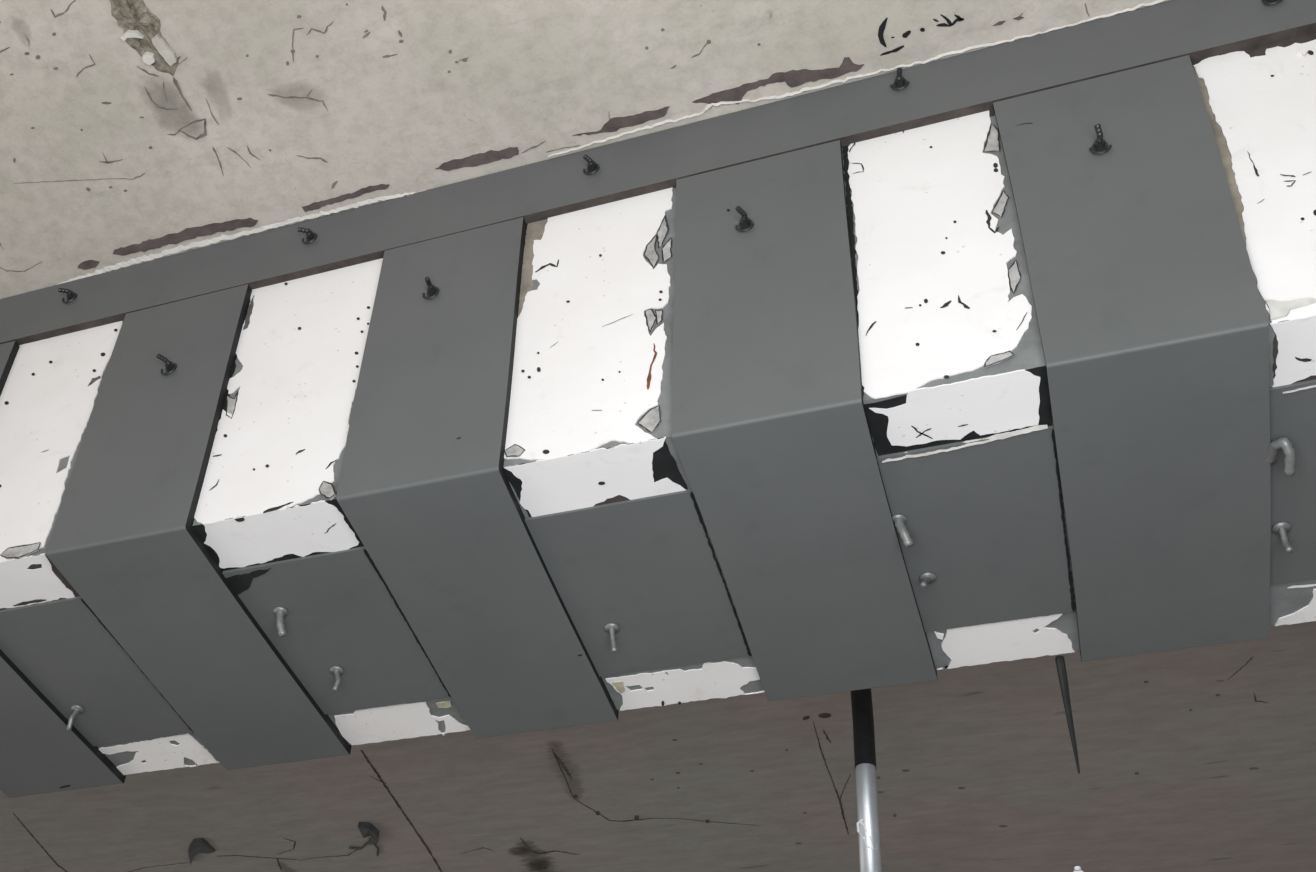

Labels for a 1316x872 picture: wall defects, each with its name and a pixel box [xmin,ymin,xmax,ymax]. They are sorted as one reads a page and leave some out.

spalling [110,0,224,176]
peeling [0,321,123,608]
peeling [194,258,383,568]
peeling [504,187,686,517]
peeling [848,110,1040,447]
peeling [1193,39,1316,387]
crack [13,813,67,872]
crack [129,839,357,872]
peeling [334,701,470,746]
crack [361,750,493,872]
crack [552,749,758,826]
peeling [606,661,764,711]